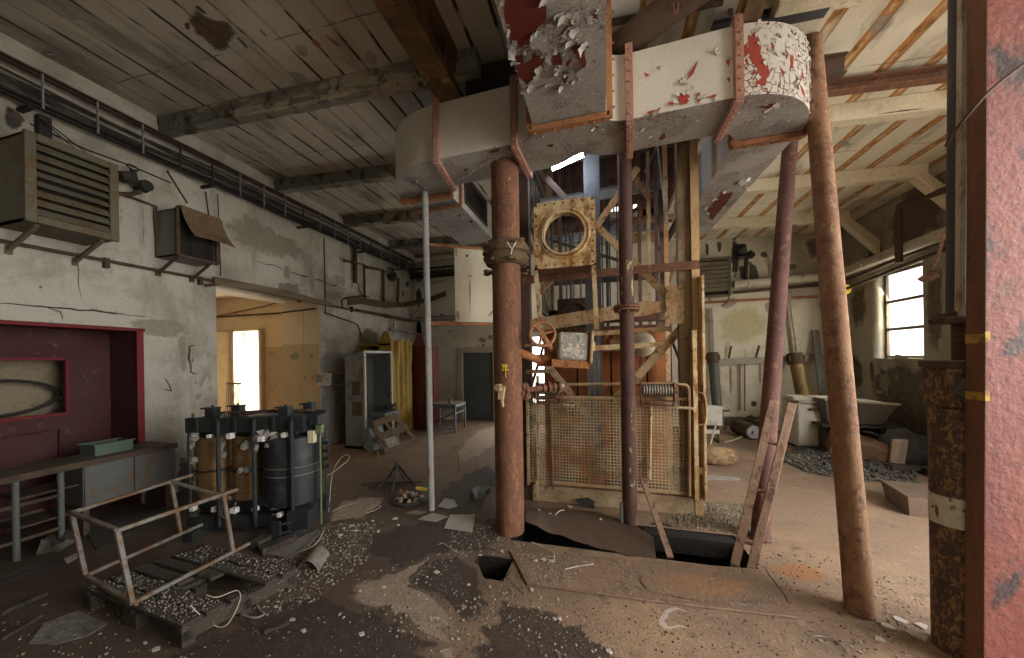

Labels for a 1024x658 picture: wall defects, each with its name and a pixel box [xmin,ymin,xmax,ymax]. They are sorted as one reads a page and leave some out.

leakage [183,3,249,55]
peeling [499,0,604,96]
peeling [715,19,812,113]
peeling [641,61,722,141]
peeling [738,102,793,122]
peeling [704,177,752,223]
crack [0,266,149,319]
corrosion [767,562,832,585]